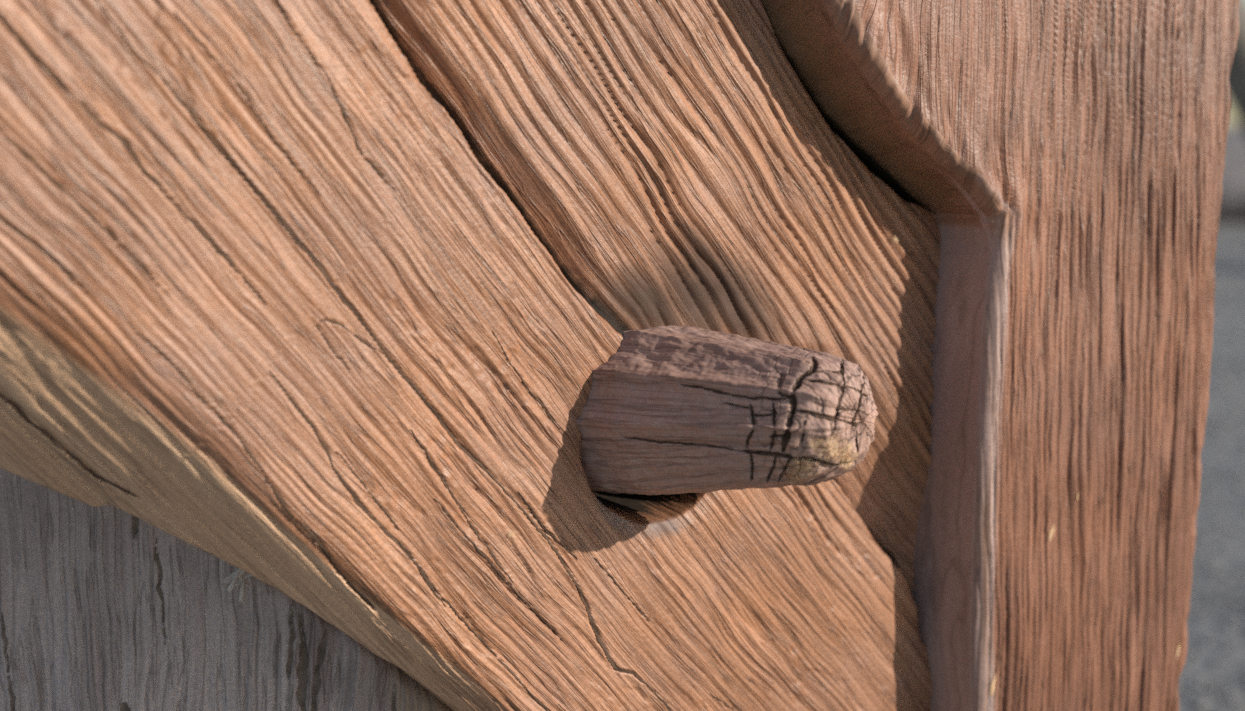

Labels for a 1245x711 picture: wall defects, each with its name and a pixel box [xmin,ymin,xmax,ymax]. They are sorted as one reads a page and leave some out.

crack [96,0,671,711]
crack [624,357,871,483]